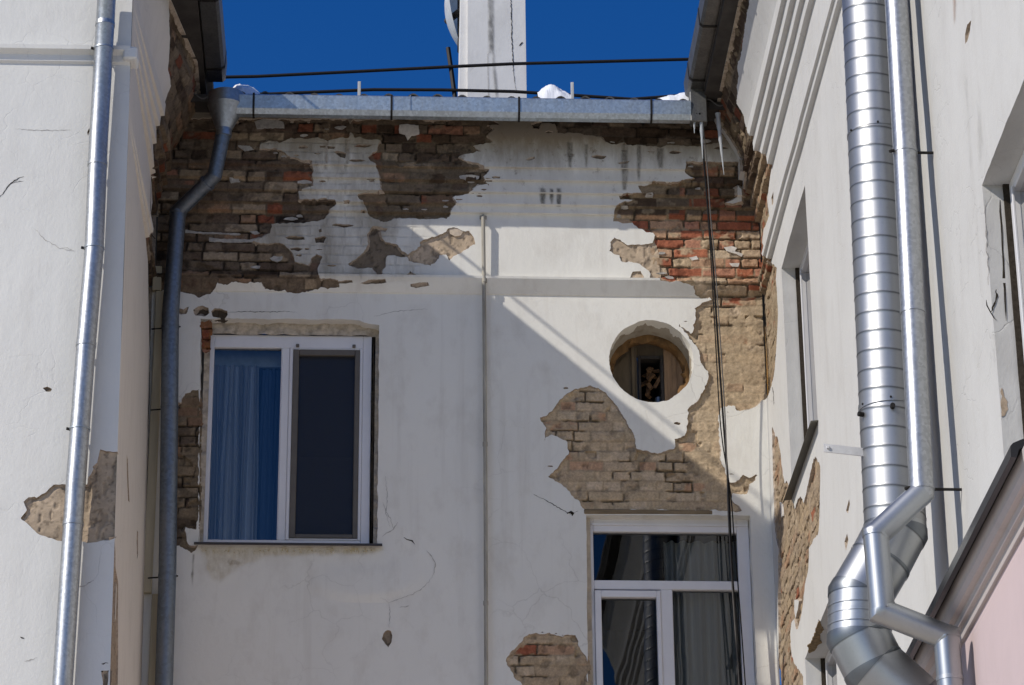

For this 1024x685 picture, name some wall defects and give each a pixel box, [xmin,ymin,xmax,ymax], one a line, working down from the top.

spalling [146,9,216,296]
spalling [181,119,499,353]
spalling [532,0,778,512]
spalling [21,487,65,541]
spalling [82,451,117,543]
spalling [177,390,203,553]
spalling [382,631,392,646]
crack [370,342,436,622]
spalling [506,633,591,685]
spalling [774,433,820,685]
spalling [807,619,824,653]